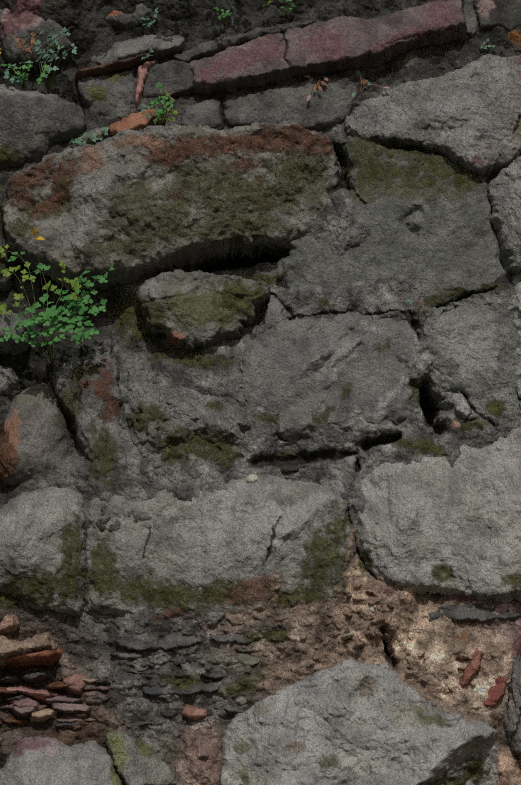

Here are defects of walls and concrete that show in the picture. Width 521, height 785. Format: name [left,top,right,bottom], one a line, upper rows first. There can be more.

crack [263,517,281,565]